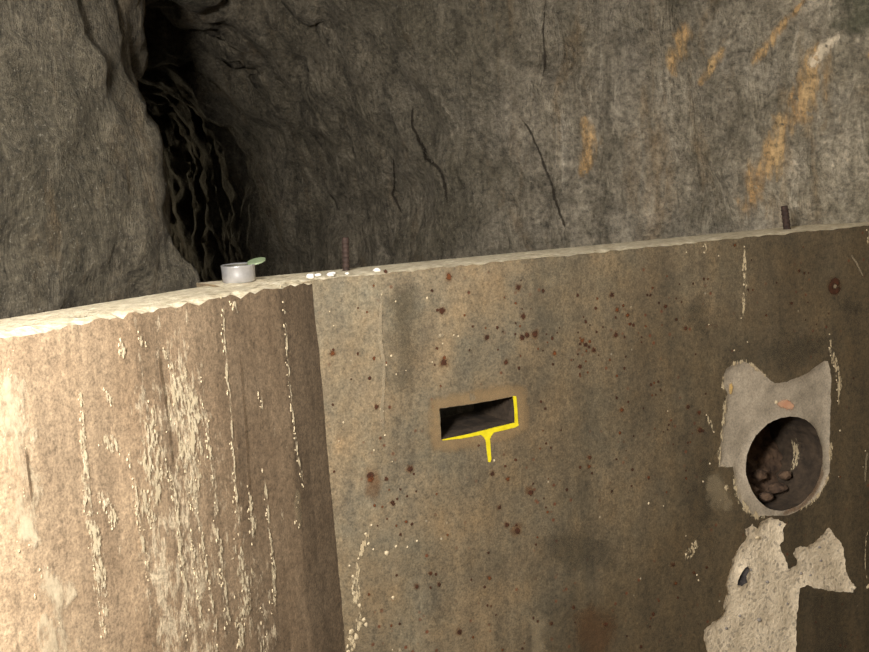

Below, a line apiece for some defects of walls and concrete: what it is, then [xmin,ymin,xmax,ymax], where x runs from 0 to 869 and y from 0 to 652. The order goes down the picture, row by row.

crack [540,3,548,72]
crack [391,160,402,212]
crack [411,110,448,201]
crack [524,123,565,227]
leakage [220,296,231,397]
corrosion [485,297,560,366]
leakage [282,301,304,508]
leakage [78,393,109,639]
leakage [127,363,276,652]
spalling [704,360,869,652]